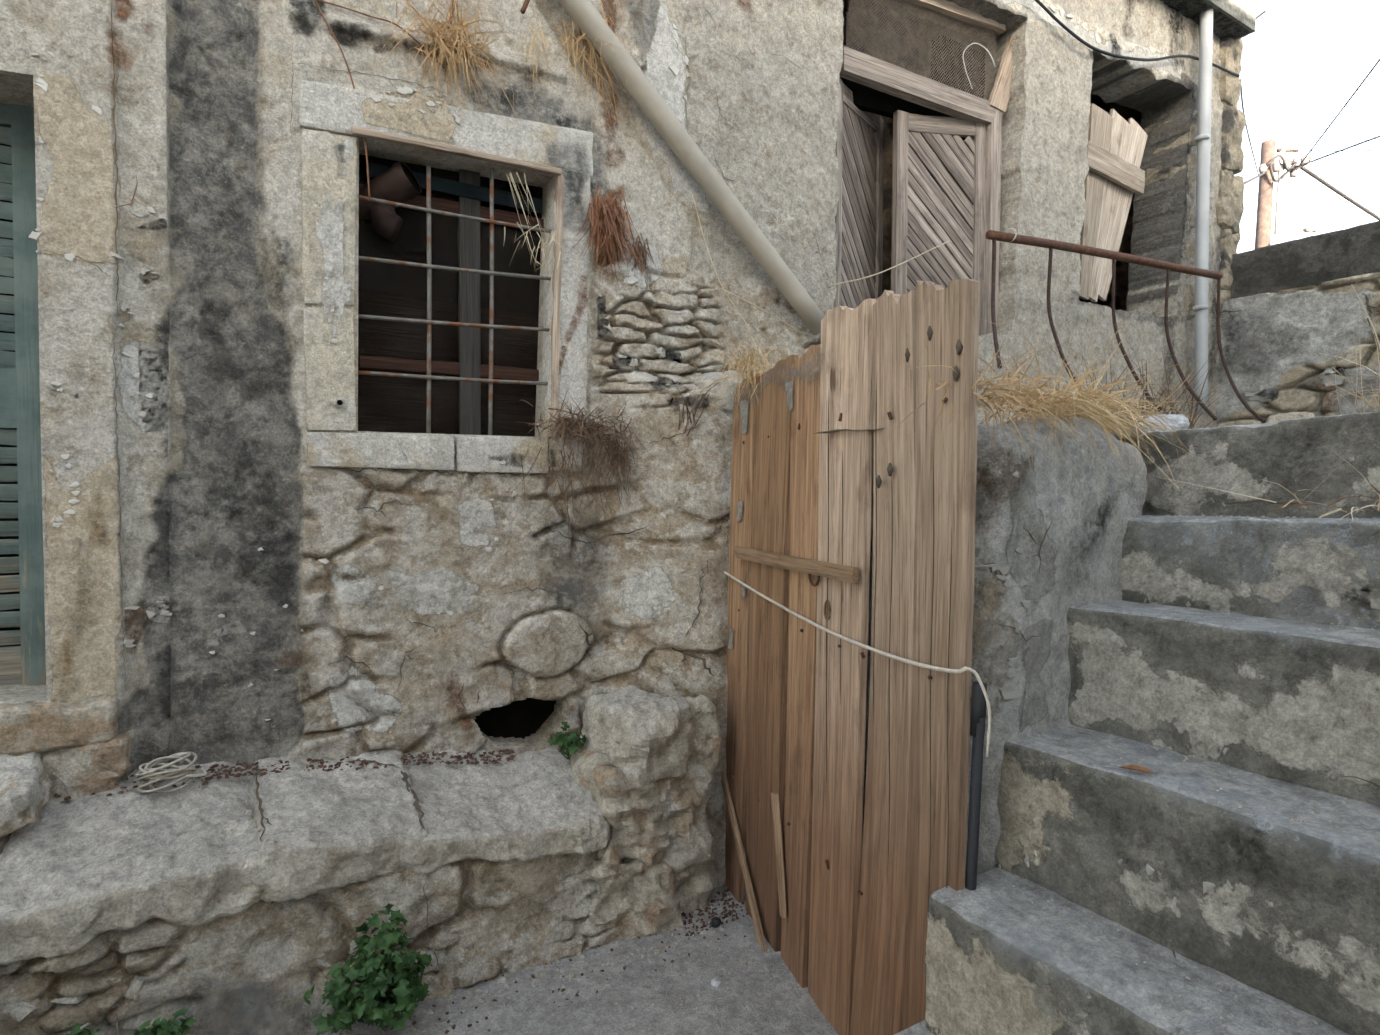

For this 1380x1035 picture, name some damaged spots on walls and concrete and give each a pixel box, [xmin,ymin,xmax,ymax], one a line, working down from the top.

leakage [157,314,170,369]
spalling [597,293,612,337]
spalling [613,353,638,367]
spalling [648,347,709,412]
leakage [158,645,171,718]